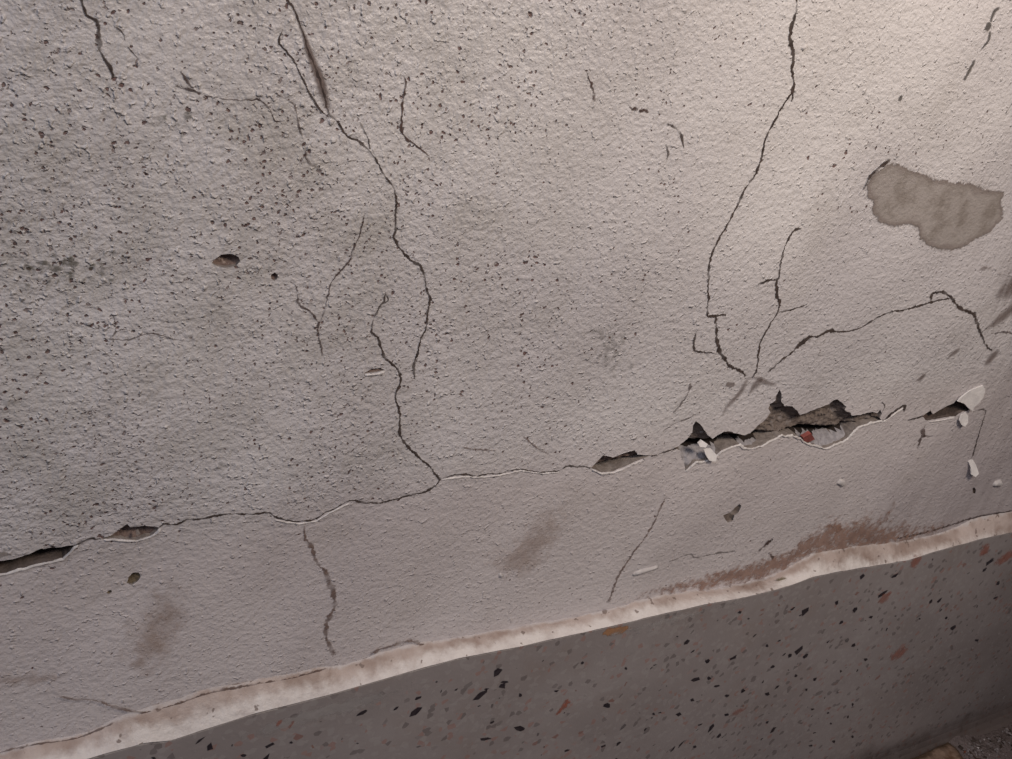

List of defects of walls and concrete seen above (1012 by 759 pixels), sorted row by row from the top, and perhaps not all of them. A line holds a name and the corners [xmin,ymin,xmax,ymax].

crack [629,106,684,158]
crack [693,0,1011,378]
crack [0,0,590,753]
spalling [592,450,650,475]
spalling [674,390,883,472]
crack [882,402,926,448]
spalling [923,385,985,427]
crack [968,409,986,477]
spalling [0,545,78,576]
spalling [101,524,161,542]
crack [608,501,664,601]
rust [661,511,918,595]